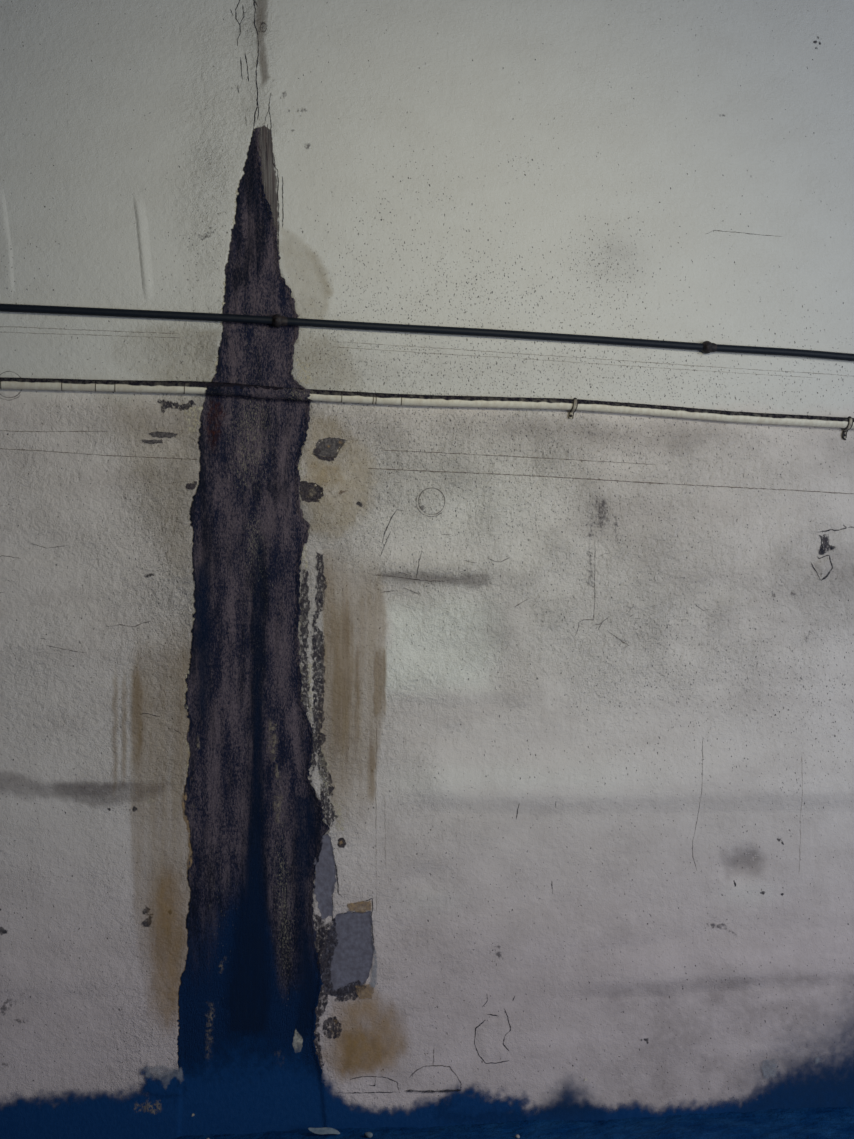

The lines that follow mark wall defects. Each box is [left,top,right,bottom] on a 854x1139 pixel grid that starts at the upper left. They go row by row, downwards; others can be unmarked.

crack [230,0,284,255]
damp [212,126,305,389]
spalling [313,750,375,1002]
damp [0,395,854,1139]
spalling [323,1016,342,1039]